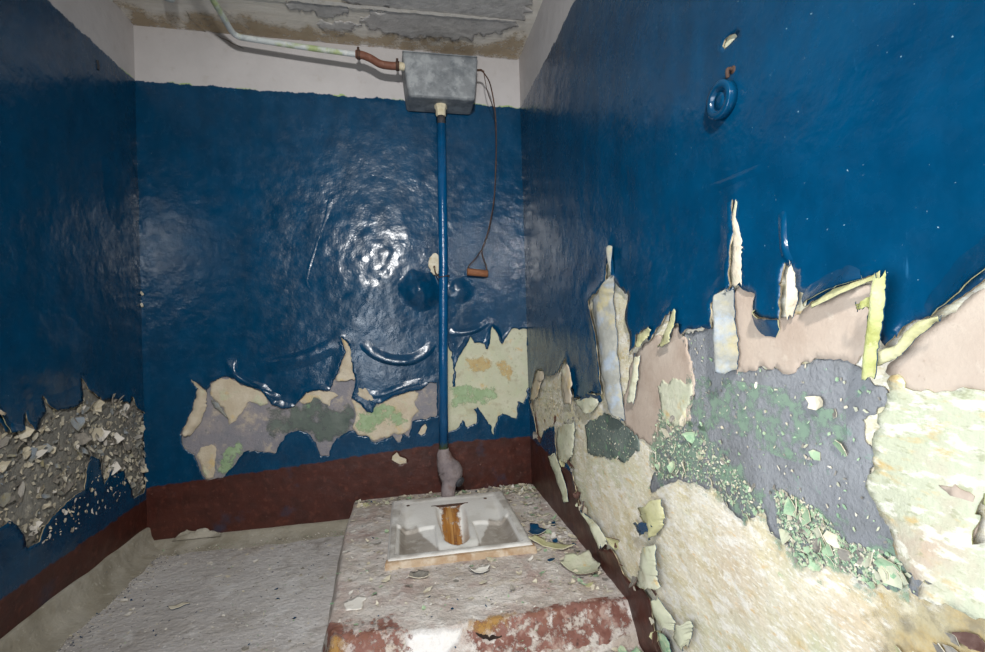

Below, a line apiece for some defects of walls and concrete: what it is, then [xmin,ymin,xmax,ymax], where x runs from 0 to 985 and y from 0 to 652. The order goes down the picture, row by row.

spalling [285,0,533,42]
peeling [0,379,148,547]
peeling [181,200,985,652]